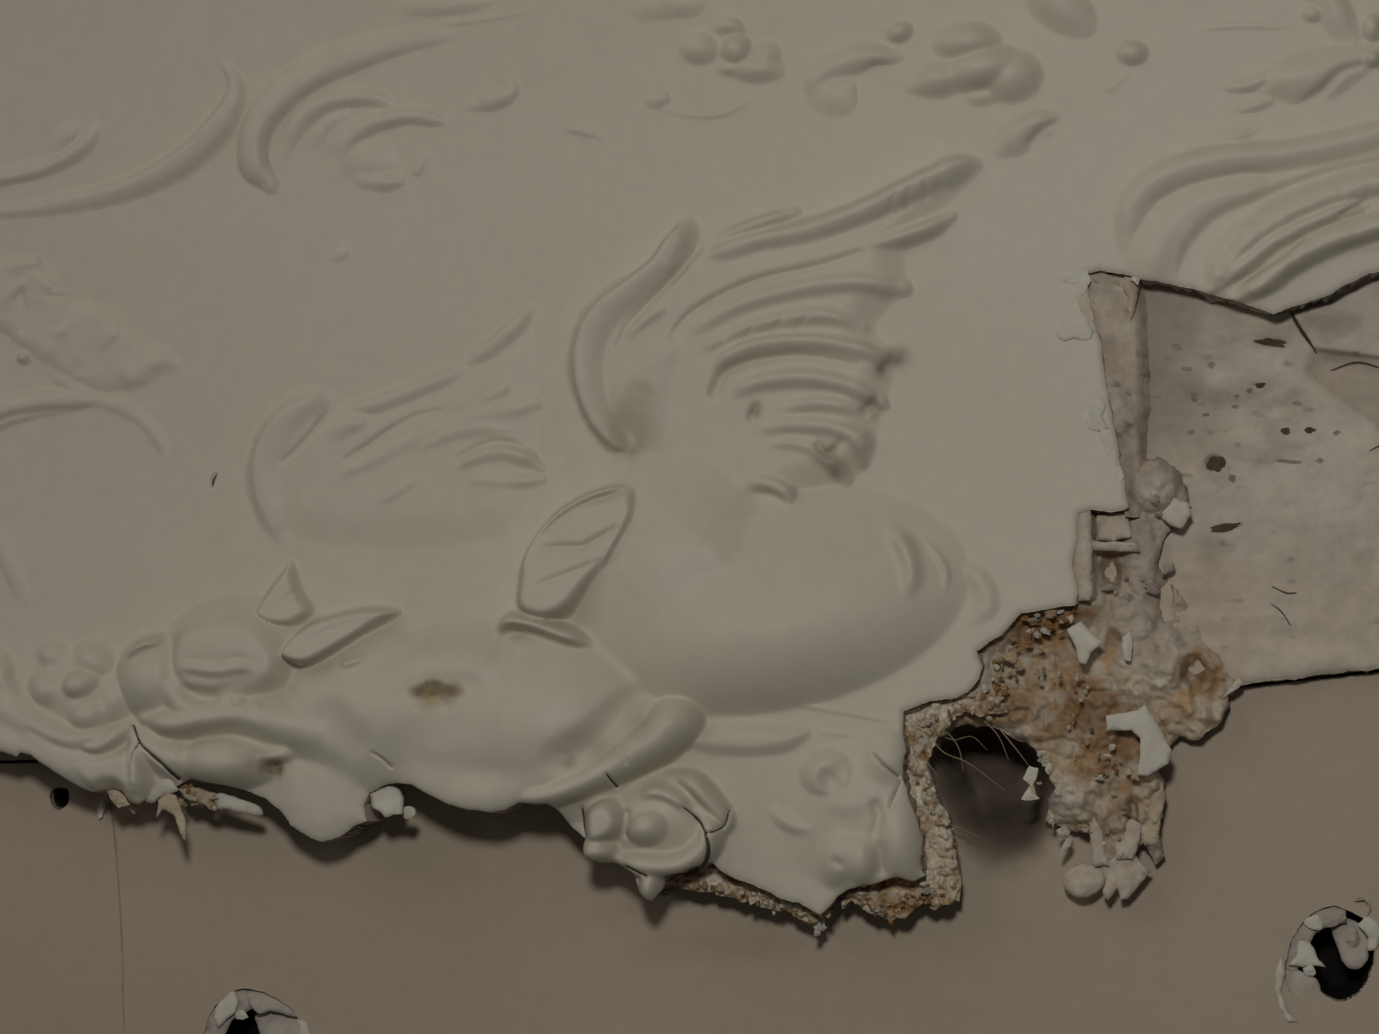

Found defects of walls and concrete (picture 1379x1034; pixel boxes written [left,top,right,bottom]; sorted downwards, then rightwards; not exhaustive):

flaking render [935,272,1379,901]
crack [130,725,181,780]
spalling [50,788,69,808]
crack [684,807,730,869]
spalling [1297,910,1374,1000]
spalling [226,1009,260,1034]